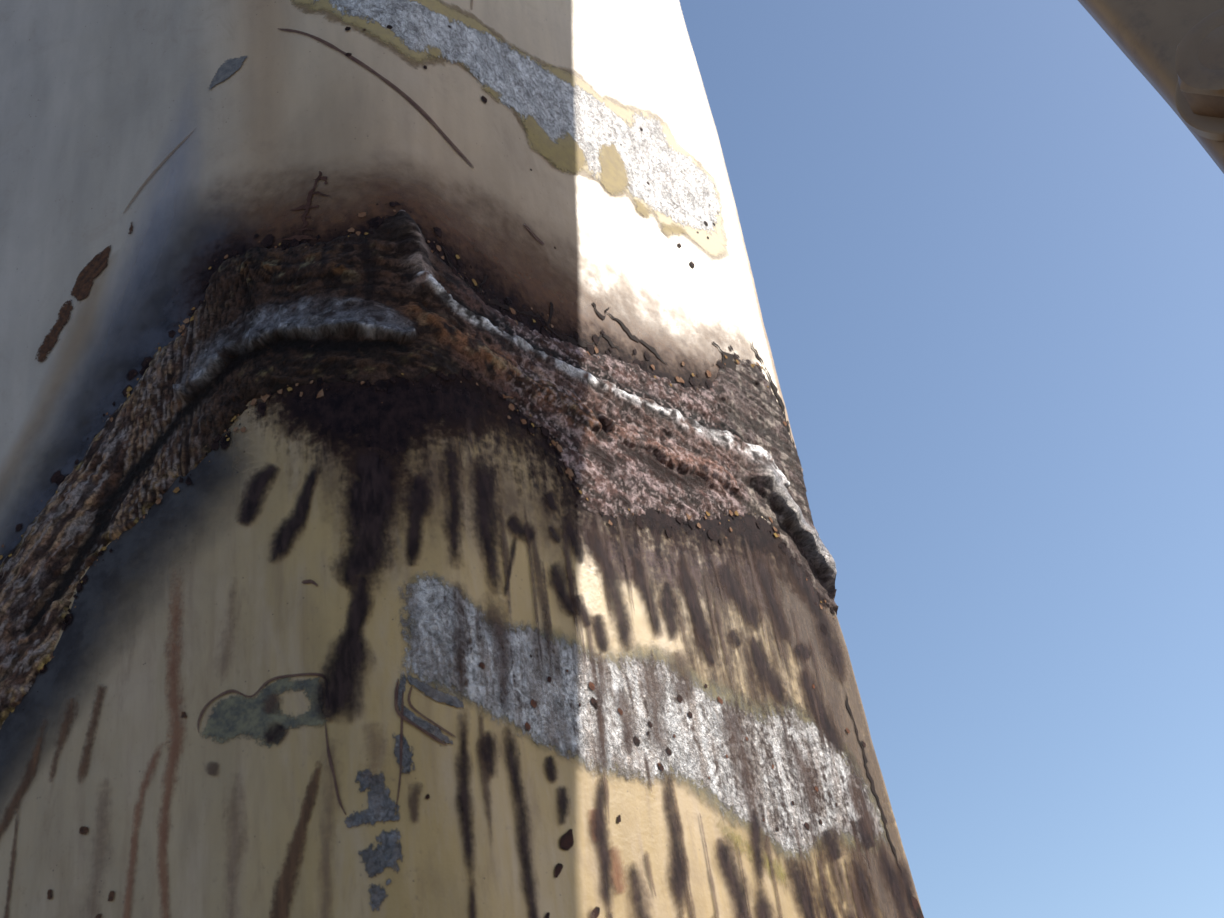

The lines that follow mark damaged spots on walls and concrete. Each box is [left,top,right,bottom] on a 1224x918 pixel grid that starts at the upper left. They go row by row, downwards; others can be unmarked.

peeling [294,0,727,256]
leakage [0,175,789,567]
rust [124,601,183,918]
leakage [0,368,846,918]
peeling [181,576,885,912]
rust [610,850,623,892]
crack [839,677,901,870]